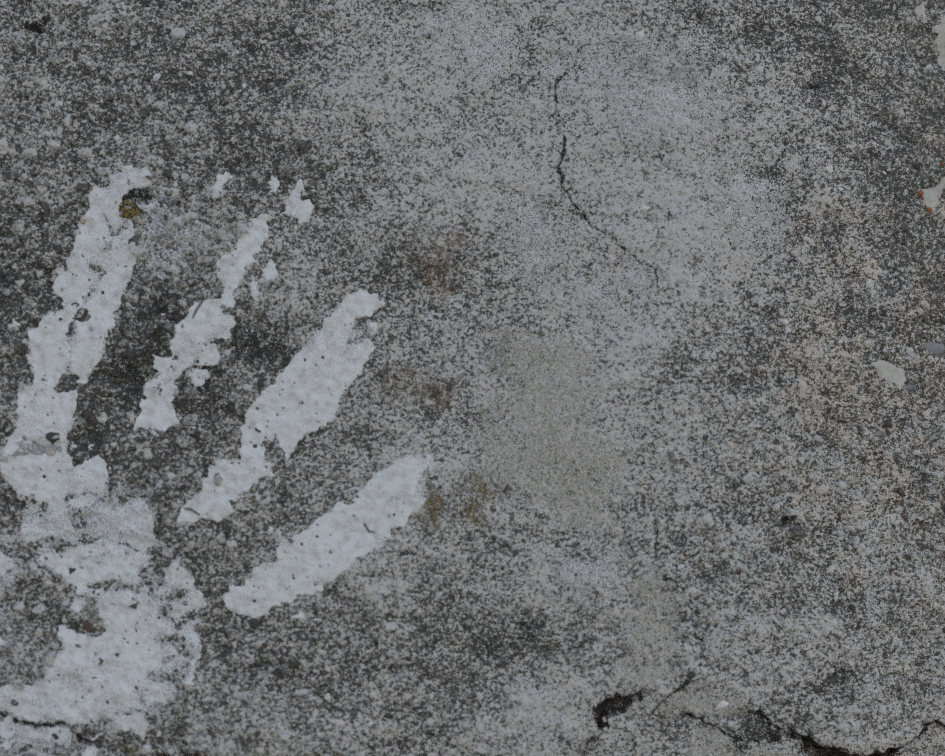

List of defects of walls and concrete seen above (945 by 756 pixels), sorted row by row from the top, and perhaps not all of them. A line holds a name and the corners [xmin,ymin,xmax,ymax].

crack [578,622,945,756]